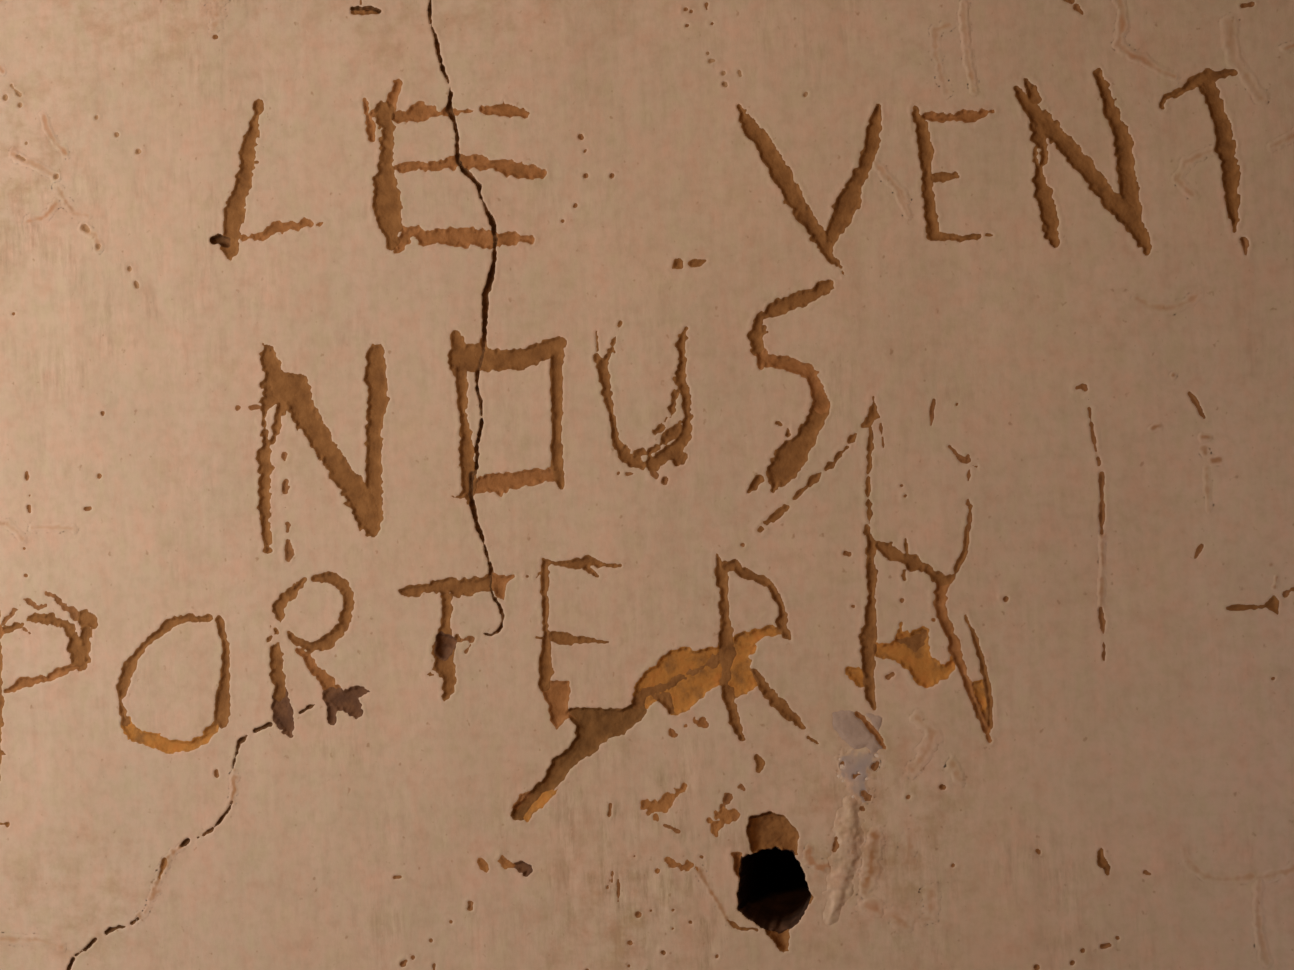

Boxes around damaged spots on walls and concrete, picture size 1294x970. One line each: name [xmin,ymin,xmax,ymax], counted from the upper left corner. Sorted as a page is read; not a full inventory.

crack [428,0,505,636]
peeling [845,666,864,688]
crack [67,704,315,970]
peeling [510,644,758,822]
spalling [640,782,687,834]
spalling [706,784,746,838]
spalling [754,754,765,773]
spalling [727,836,839,934]